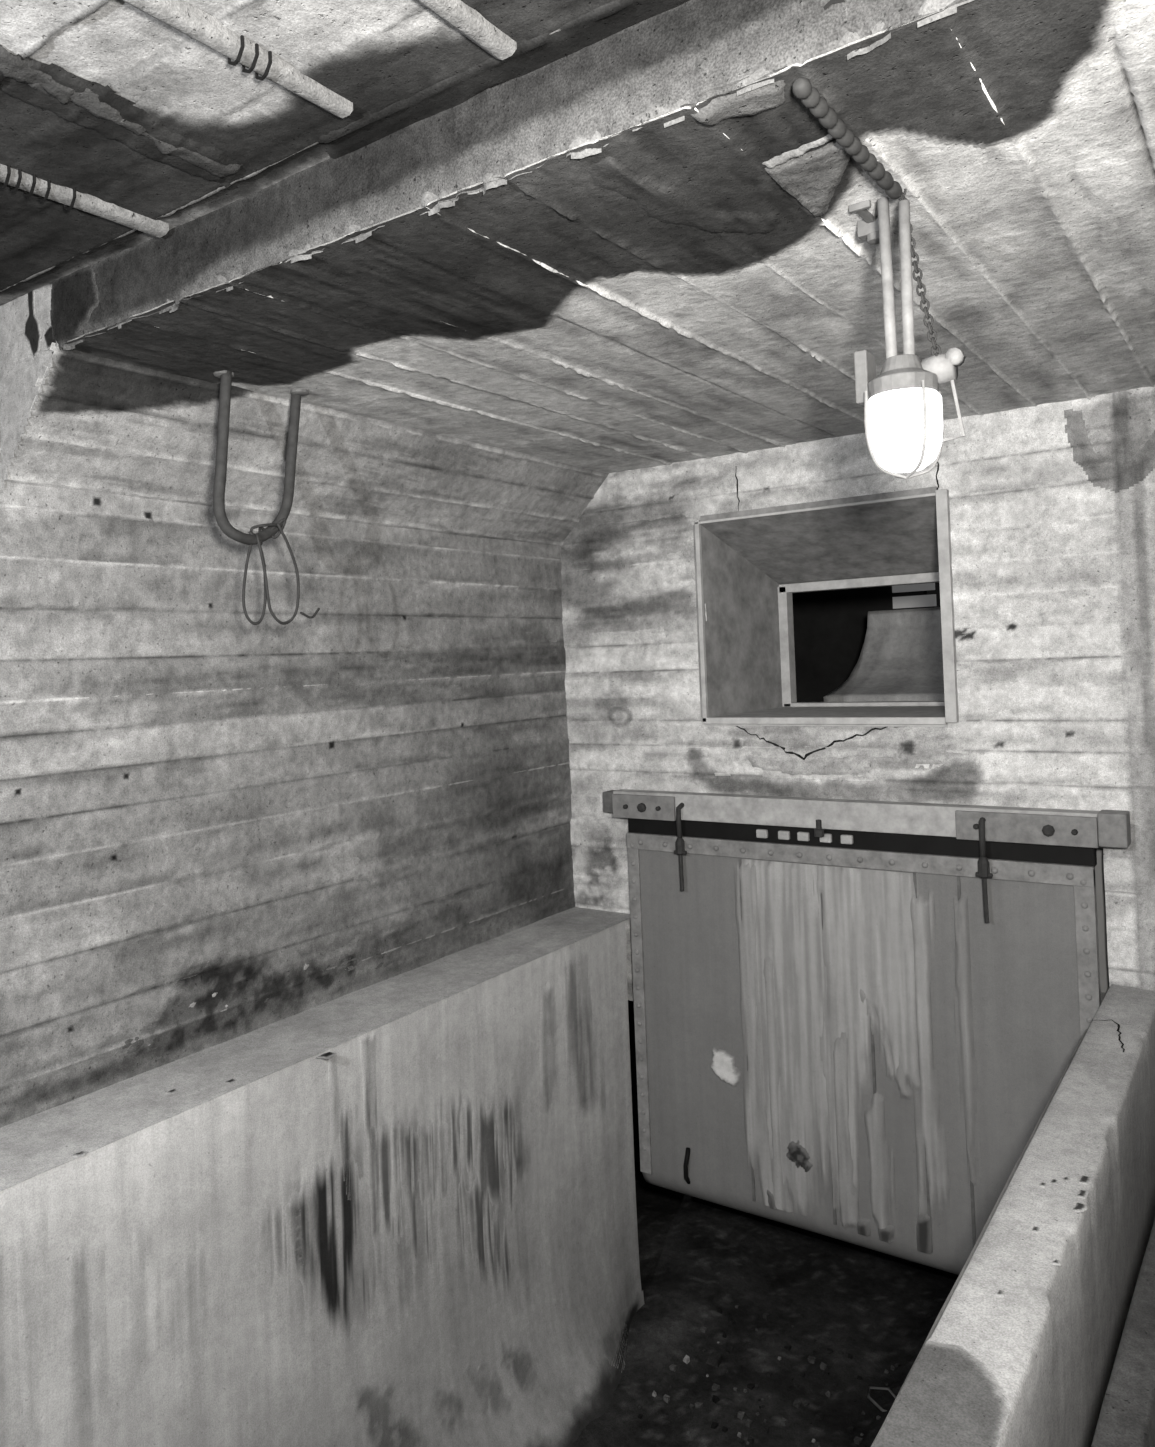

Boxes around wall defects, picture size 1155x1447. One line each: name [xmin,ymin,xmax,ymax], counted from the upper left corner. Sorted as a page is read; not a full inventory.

water stain [0,733,575,1127]
water stain [258,1087,531,1346]
water stain [513,1287,644,1447]